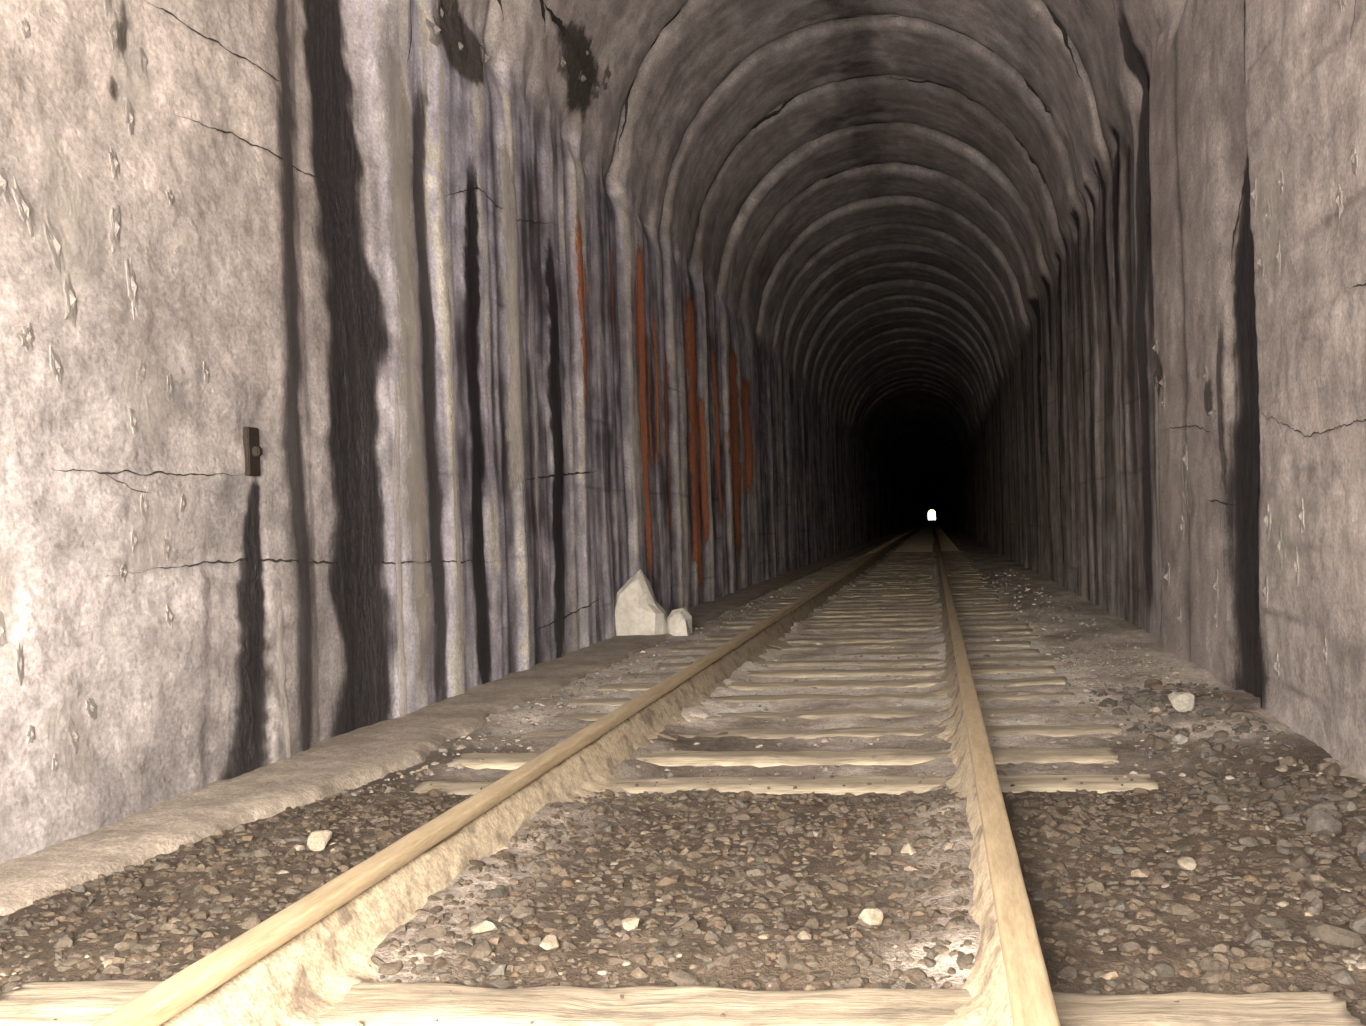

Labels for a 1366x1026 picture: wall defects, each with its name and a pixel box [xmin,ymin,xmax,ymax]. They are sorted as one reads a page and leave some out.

crack [407,0,441,62]
spalling [426,0,489,85]
crack [540,0,587,73]
spalling [556,22,611,118]
crack [39,466,235,493]
damp [222,0,491,780]
damp [499,149,565,658]
corrosion [575,213,588,412]
corrosion [634,247,672,577]
corrosion [685,296,754,589]
damp [1216,155,1267,709]
crack [1263,414,1366,437]